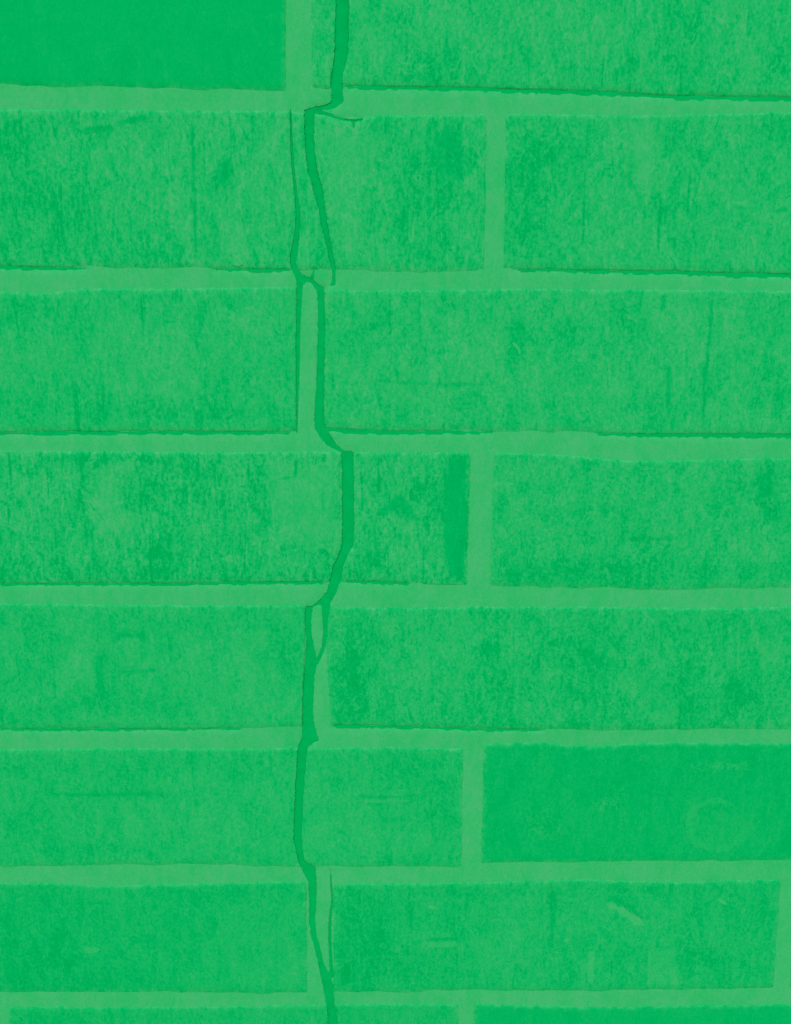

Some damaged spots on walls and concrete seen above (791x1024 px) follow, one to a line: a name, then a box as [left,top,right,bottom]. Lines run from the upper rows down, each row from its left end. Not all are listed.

crack [0,110,493,1024]
crack [304,0,791,286]